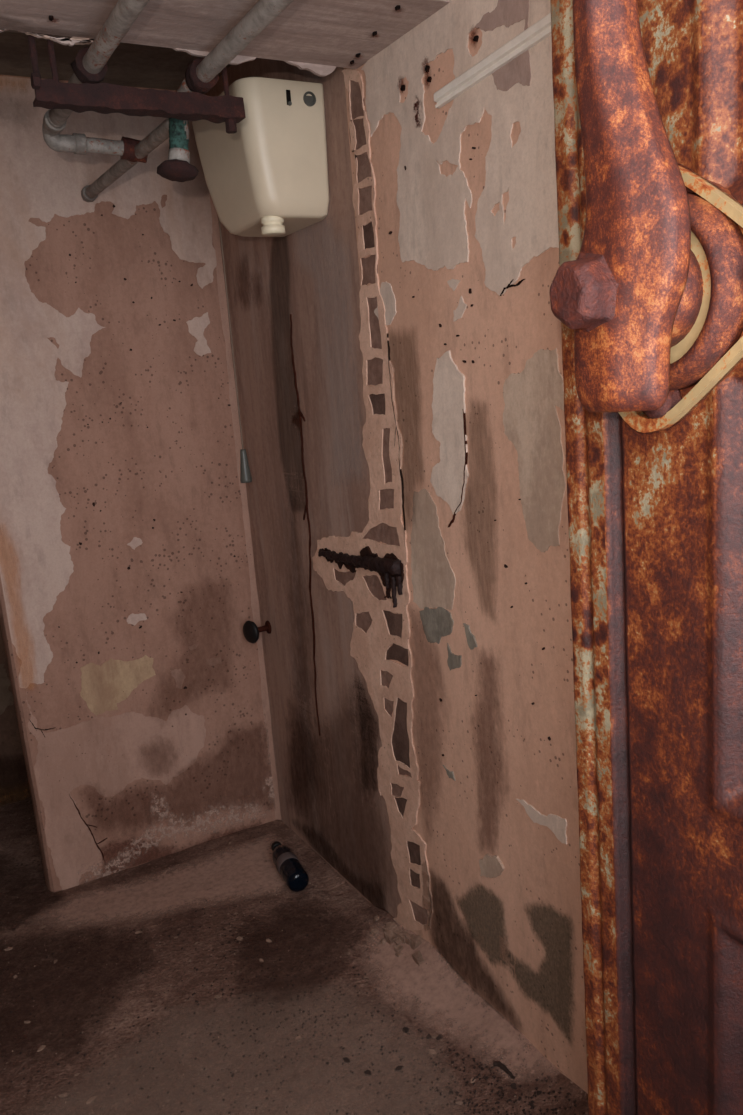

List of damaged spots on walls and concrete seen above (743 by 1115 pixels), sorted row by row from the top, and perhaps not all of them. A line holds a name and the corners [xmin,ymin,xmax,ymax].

spalling [0,29,94,46]
spalling [172,48,210,57]
spalling [229,55,257,65]
peeling [0,76,217,689]
peeling [285,0,567,931]
crack [69,794,107,866]
water stain [86,777,275,882]
water stain [303,827,385,911]
water stain [431,877,572,1041]